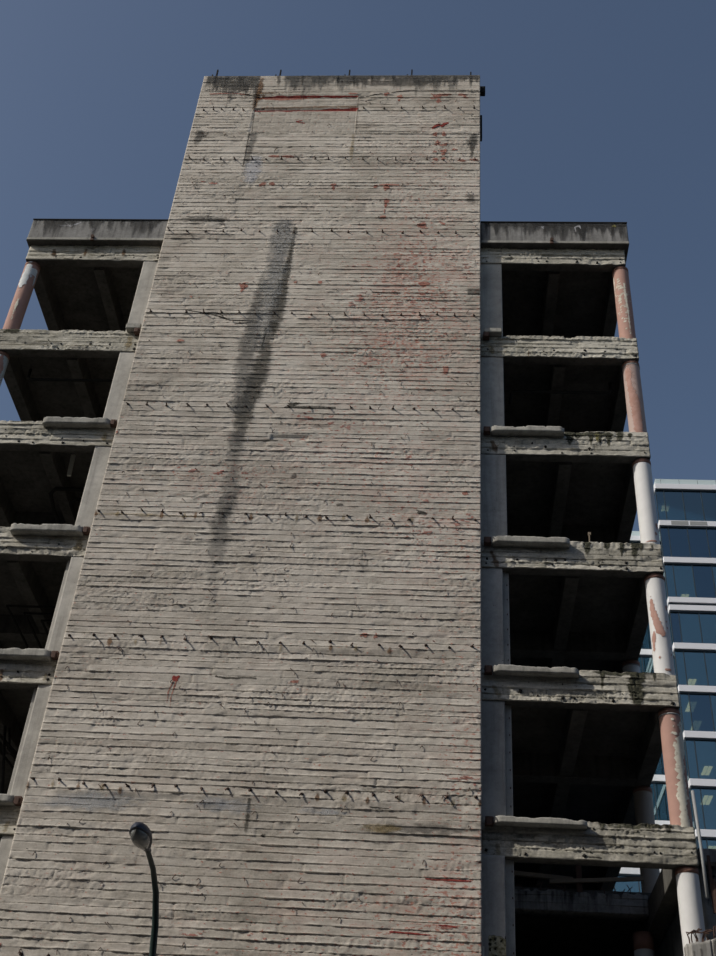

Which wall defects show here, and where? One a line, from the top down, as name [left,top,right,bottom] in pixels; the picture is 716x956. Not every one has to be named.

water stain [207,76,260,97]
water stain [485,222,626,241]
water stain [234,220,297,435]
peeling [625,365,643,432]
water stain [604,543,653,557]
peeling [650,596,672,658]